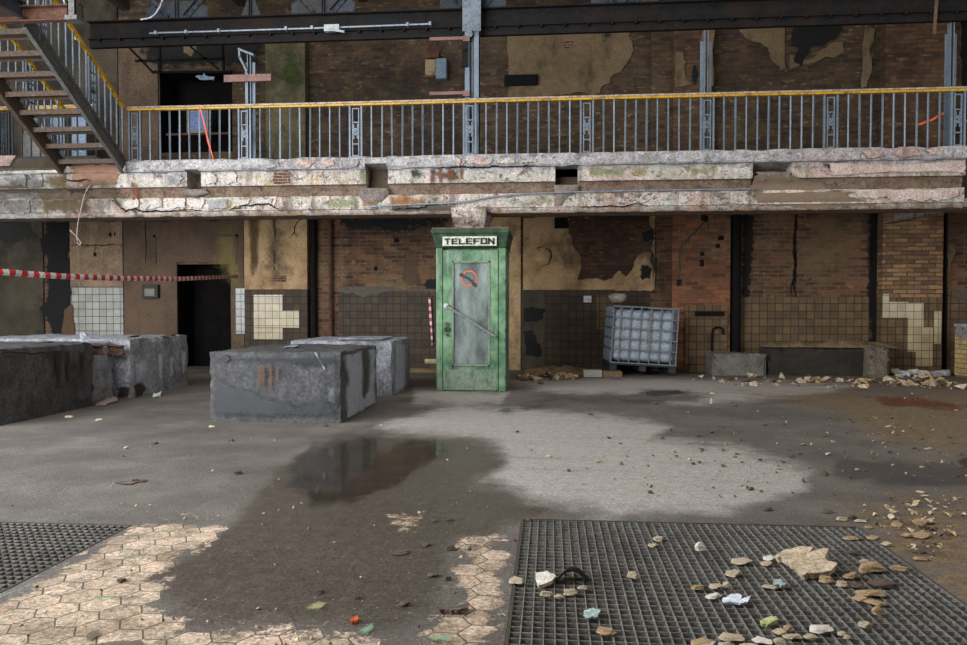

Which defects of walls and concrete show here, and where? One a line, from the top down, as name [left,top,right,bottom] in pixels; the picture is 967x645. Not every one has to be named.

peeling [121,198,273,210]
peeling [750,146,966,210]
flaking render [0,222,75,335]
flaking render [568,216,656,281]
crack [790,214,798,297]